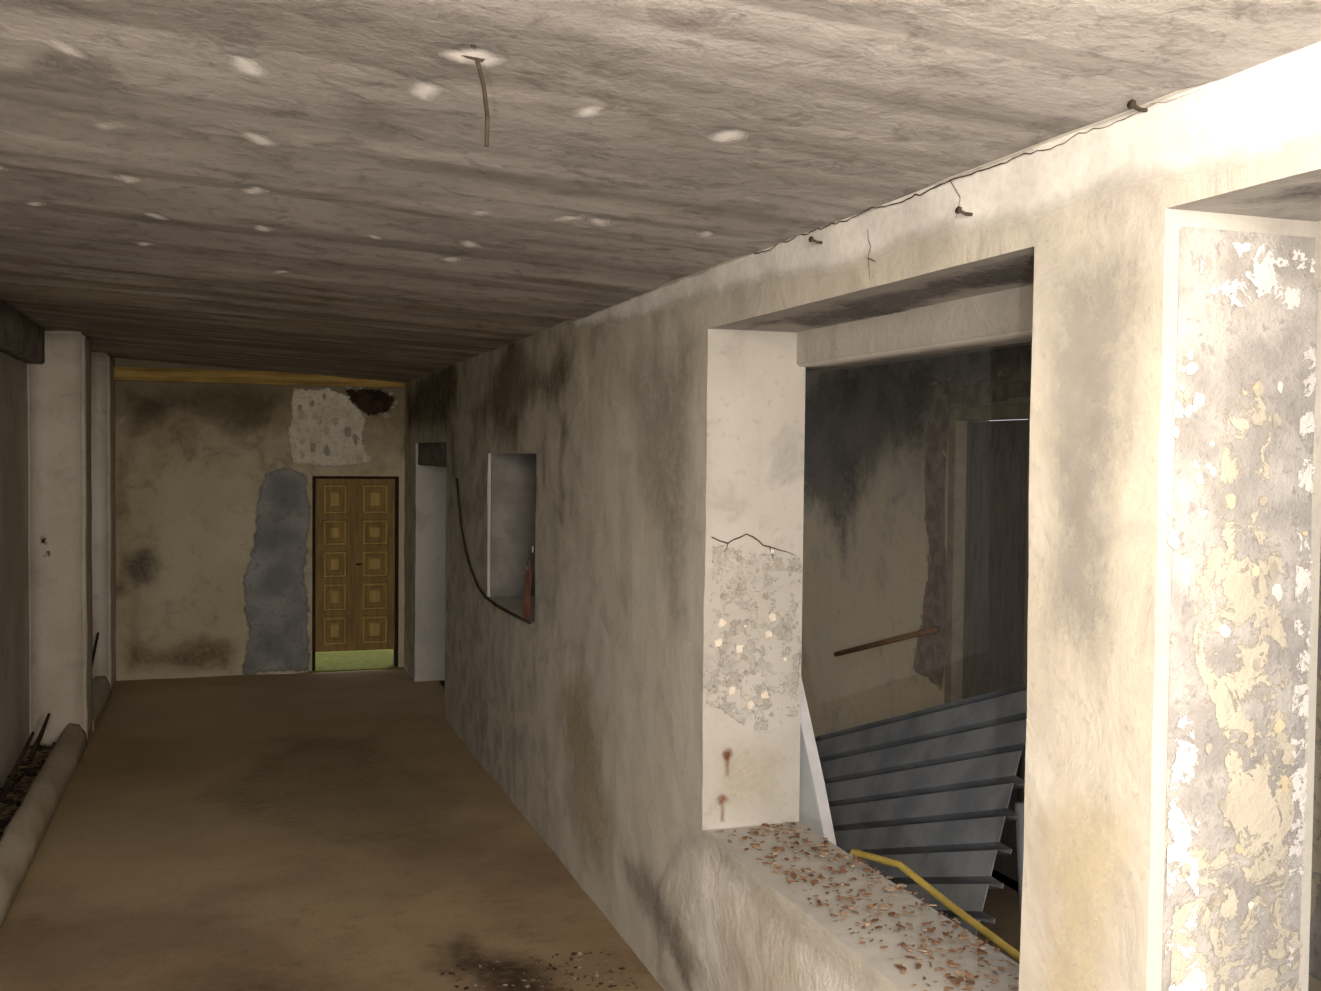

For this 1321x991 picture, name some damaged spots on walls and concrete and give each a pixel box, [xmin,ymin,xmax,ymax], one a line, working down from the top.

peeling [288,386,398,468]
water stain [804,345,1032,536]
peeling [704,545,801,731]
peeling [1162,226,1321,991]